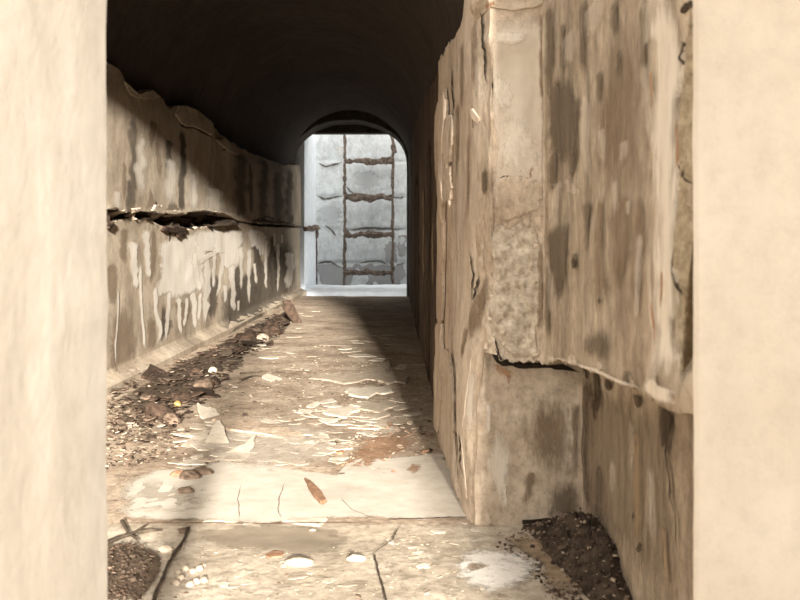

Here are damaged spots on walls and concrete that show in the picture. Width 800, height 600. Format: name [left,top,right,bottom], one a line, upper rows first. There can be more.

crack [479,11,496,94]
leakage [115,121,224,211]
leakage [234,155,293,222]
crack [244,216,297,228]
leakage [583,1,685,371]
leakage [107,228,295,366]
crack [469,254,479,301]
spalling [487,222,543,359]
leakage [537,227,576,333]
crack [492,339,578,372]
crack [439,342,473,498]
leakage [533,368,672,569]